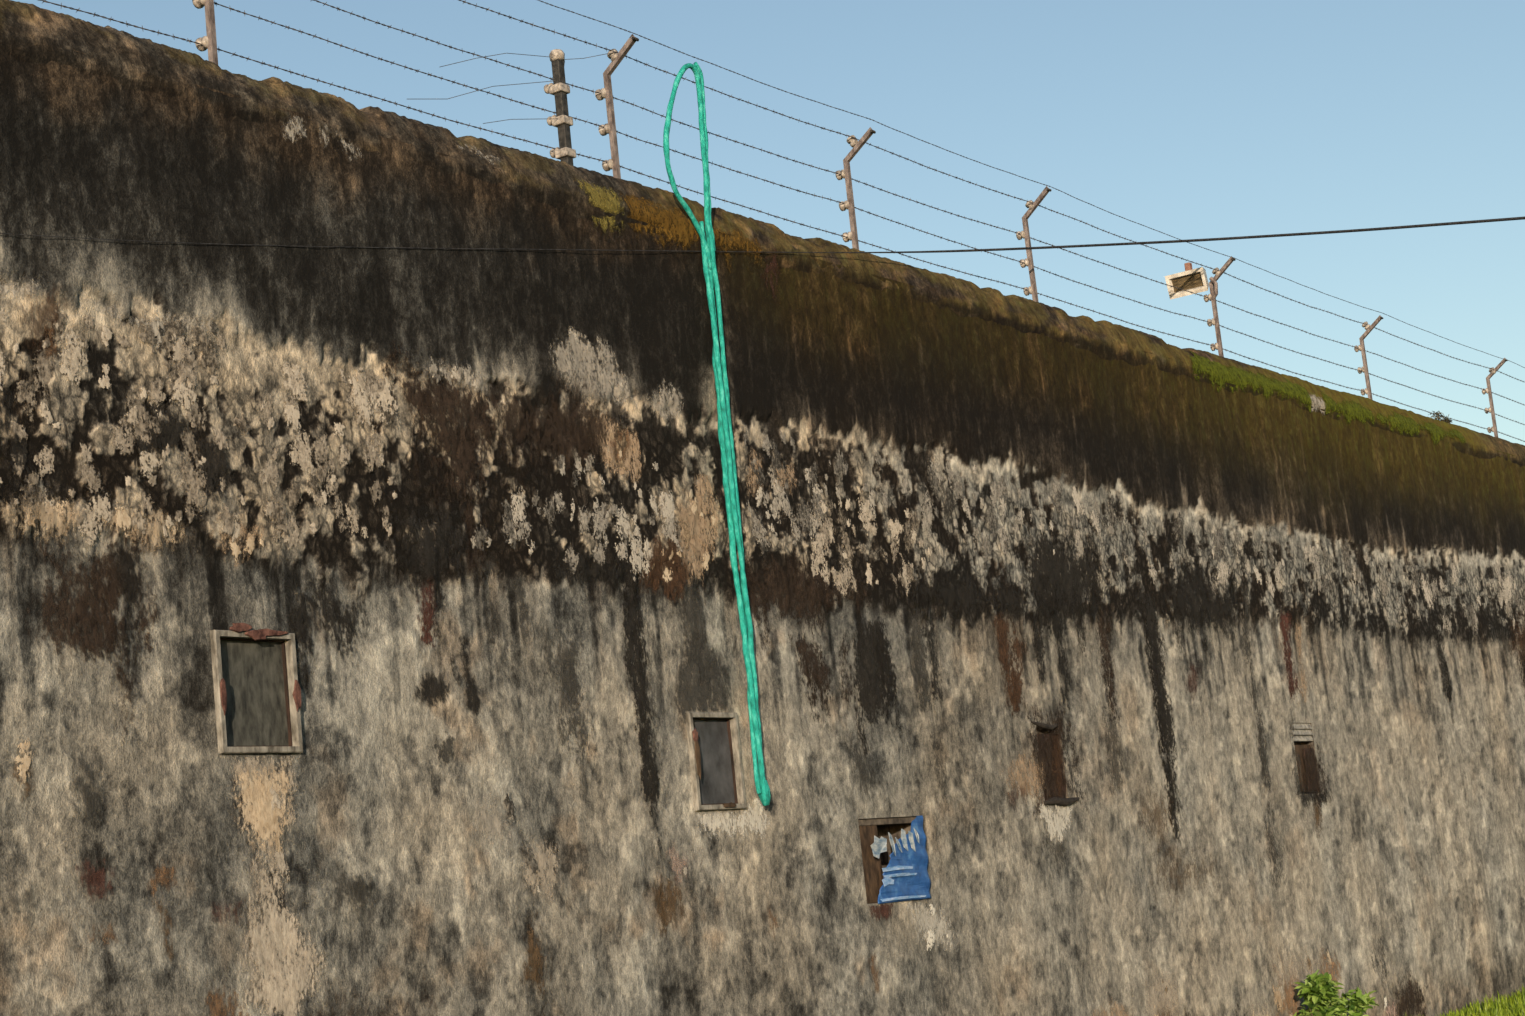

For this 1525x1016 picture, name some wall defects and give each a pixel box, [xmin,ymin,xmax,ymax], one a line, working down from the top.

damp [134,408,235,502]
damp [381,341,609,639]
damp [26,526,160,739]
rust [229,623,289,640]
rust [292,680,301,711]
damp [415,636,480,715]
damp [553,553,730,853]
damp [739,529,1123,820]
rust [994,614,1028,717]
damp [1136,553,1271,842]
damp [1435,636,1455,722]
flaking render [232,756,326,1016]